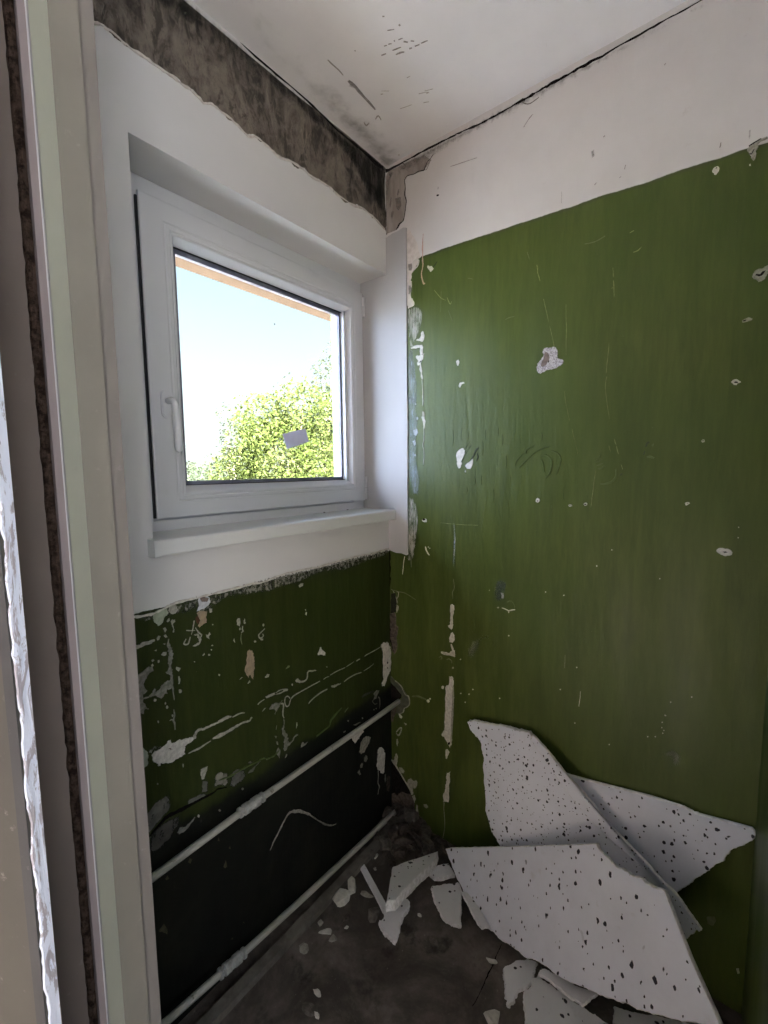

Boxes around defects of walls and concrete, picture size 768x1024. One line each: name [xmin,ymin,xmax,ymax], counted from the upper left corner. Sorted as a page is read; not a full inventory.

crack [241,0,702,235]
peeling [402,230,437,574]
spalling [536,347,564,374]
peeling [0,359,62,1024]
flaking render [147,796,200,852]
flaking render [188,761,260,804]
peeling [134,548,389,768]
spalling [344,593,431,812]
peeling [439,579,455,759]